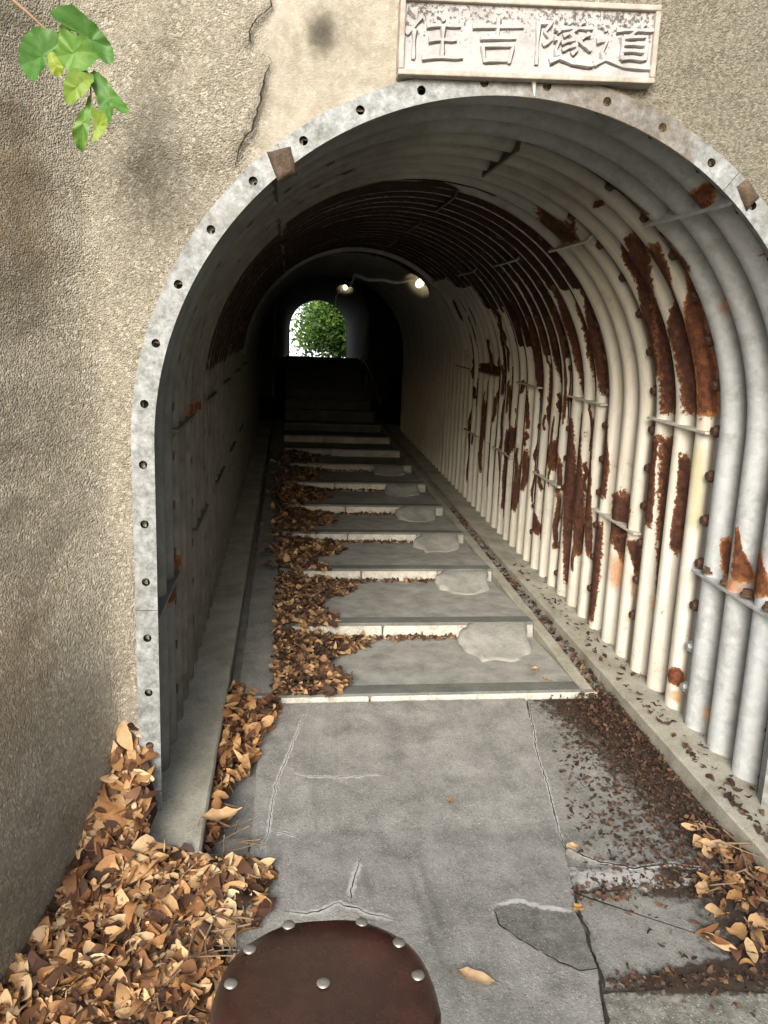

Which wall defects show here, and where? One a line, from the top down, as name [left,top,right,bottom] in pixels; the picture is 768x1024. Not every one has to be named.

crack [218,0,273,166]
rust [687,182,717,209]
rust [206,179,641,623]
rust [620,229,720,421]
rust [645,434,691,608]
rust [719,526,768,599]
rust [667,667,685,701]
crack [258,704,385,857]
crack [285,859,399,921]
crack [494,892,610,1024]